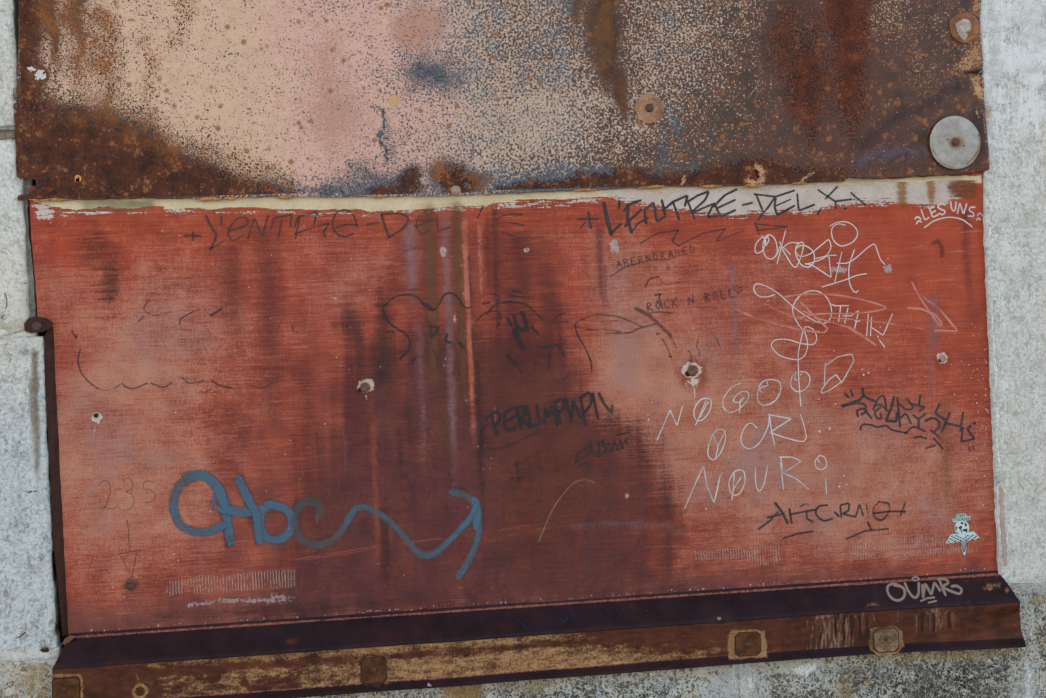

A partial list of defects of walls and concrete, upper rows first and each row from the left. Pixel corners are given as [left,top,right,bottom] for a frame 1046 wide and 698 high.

rust [13,0,303,201]
peeling [396,43,469,97]
rust [760,0,920,164]
peeling [32,103,982,220]
rust [365,153,844,195]
rust [967,109,990,164]
rust [834,604,875,642]